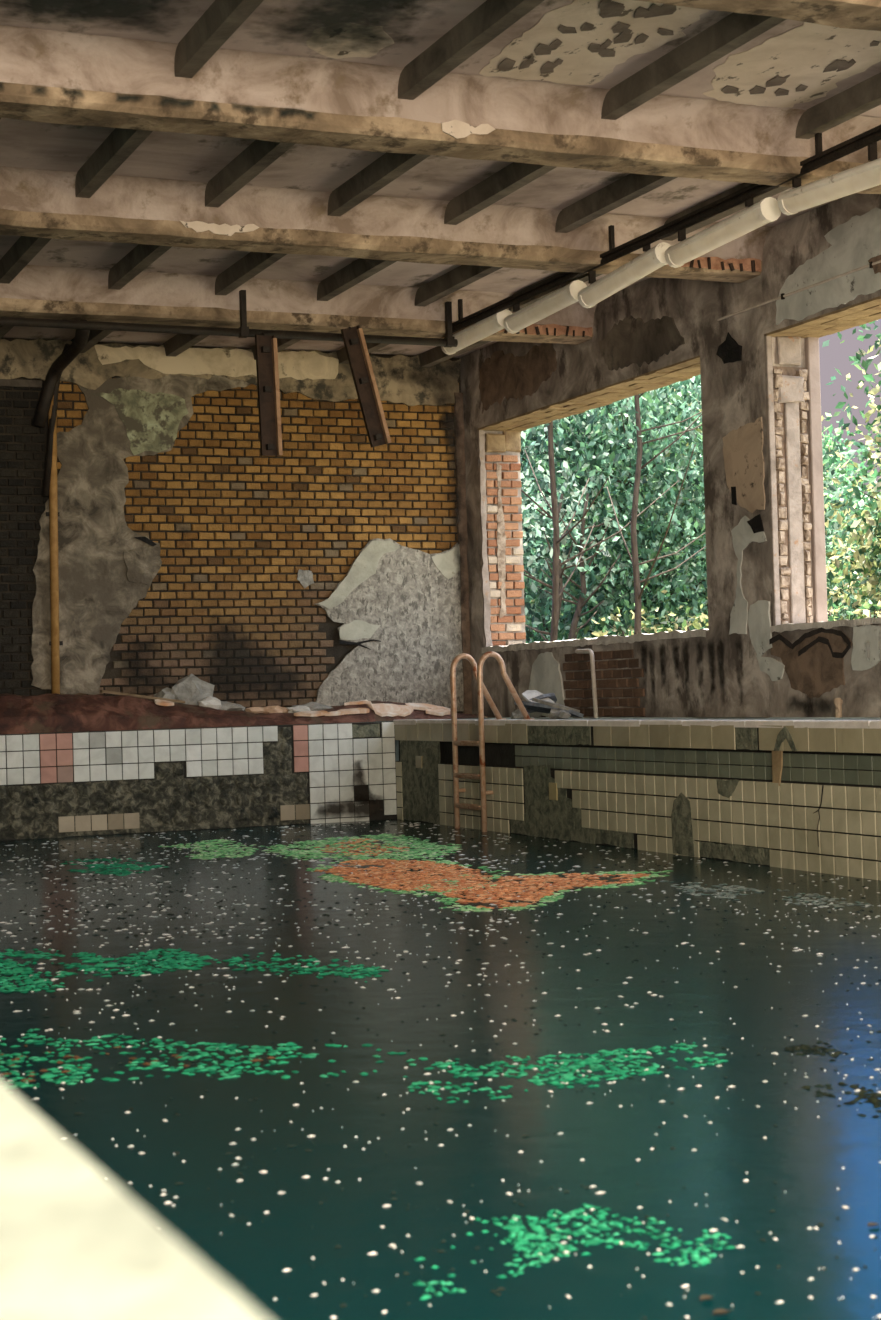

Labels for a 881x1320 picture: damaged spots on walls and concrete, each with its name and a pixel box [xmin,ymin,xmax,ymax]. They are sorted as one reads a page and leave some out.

peeling [479,0,709,85]
peeling [702,22,881,108]
peeling [776,207,881,325]
spalling [722,369,881,699]
spalling [0,378,460,840]